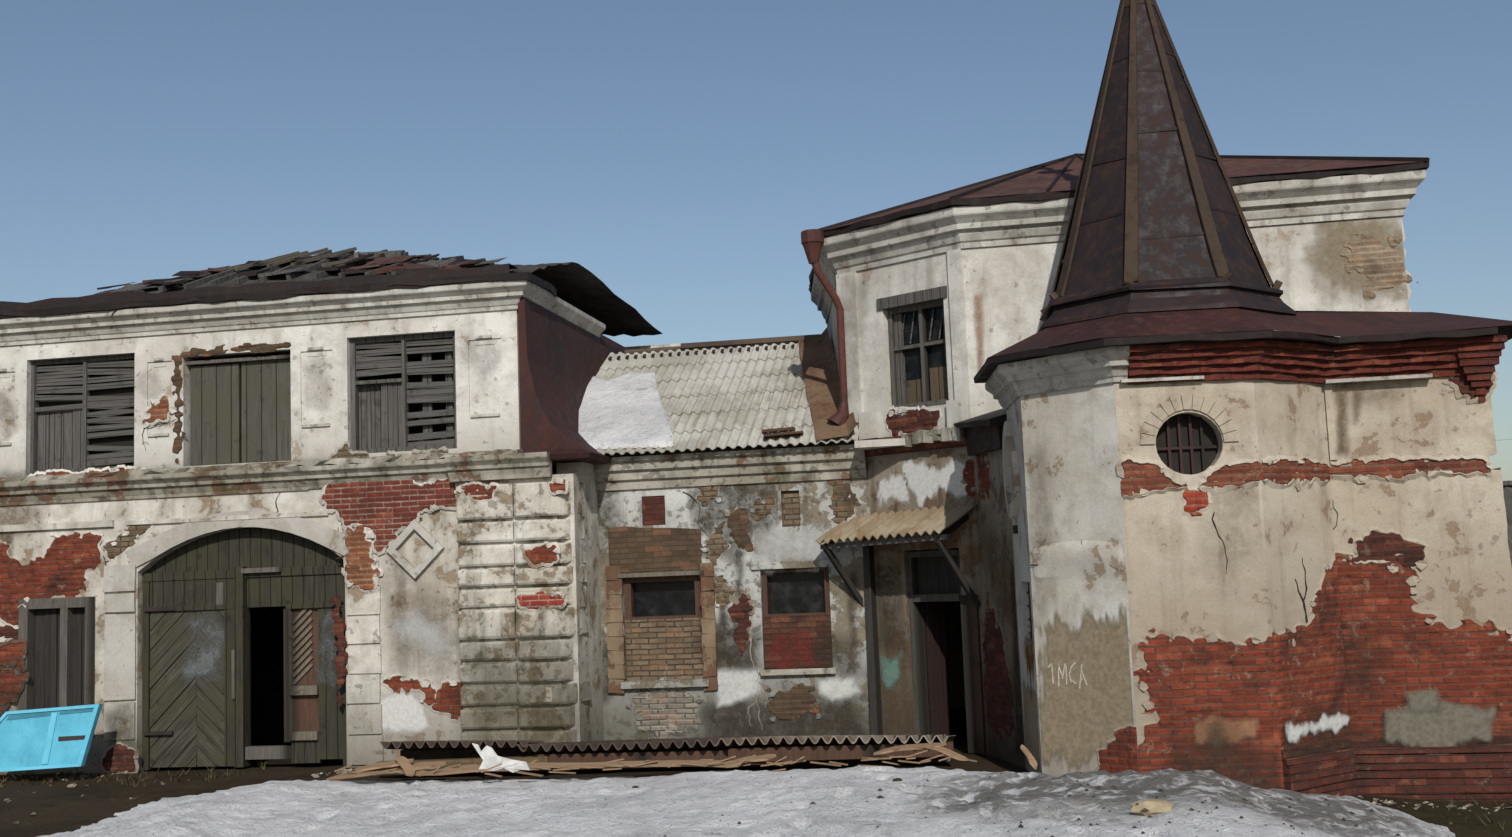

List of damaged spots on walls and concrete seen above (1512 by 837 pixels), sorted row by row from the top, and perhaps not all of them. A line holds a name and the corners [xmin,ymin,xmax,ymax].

flaking render [1312,220,1418,301]
flaking render [140,342,291,464]
spalling [328,441,448,460]
flaking render [824,479,863,543]
spalling [1116,453,1494,521]
spalling [0,518,154,717]
spalling [318,477,500,707]
spalling [381,672,463,724]
spalling [626,676,708,739]
spalling [694,485,778,659]
spalling [764,680,822,724]
spalling [1023,526,1512,790]